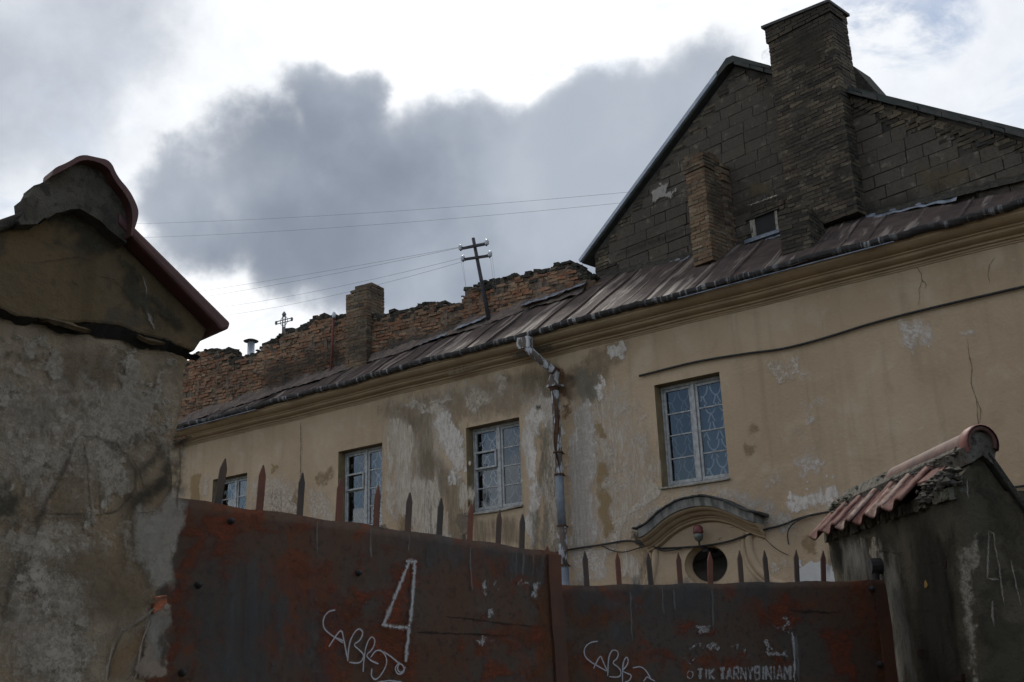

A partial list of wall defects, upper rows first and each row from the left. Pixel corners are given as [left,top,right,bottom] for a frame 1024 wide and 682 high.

flaking render [651,183,676,202]
crack [0,309,200,361]
flaking render [607,340,627,360]
damp [389,343,617,590]
flaking render [671,456,839,582]
flaking render [123,489,187,681]
rust [311,559,421,682]